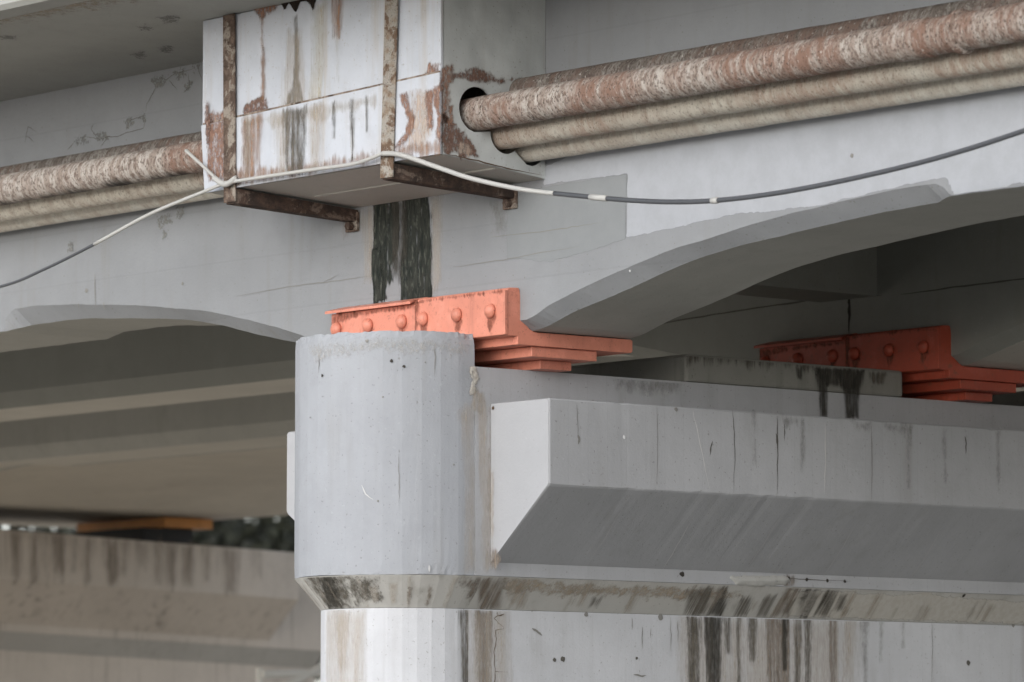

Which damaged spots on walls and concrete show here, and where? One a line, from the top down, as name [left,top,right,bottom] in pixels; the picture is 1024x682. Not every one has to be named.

rust [254,5,277,18]
rust [332,0,340,33]
rust [205,49,368,184]
rust [394,63,513,155]
leakage [371,197,432,304]
leakage [815,367,886,418]
leakage [304,576,383,609]
leakage [460,579,503,682]
crack [494,612,504,682]
leakage [687,587,853,682]